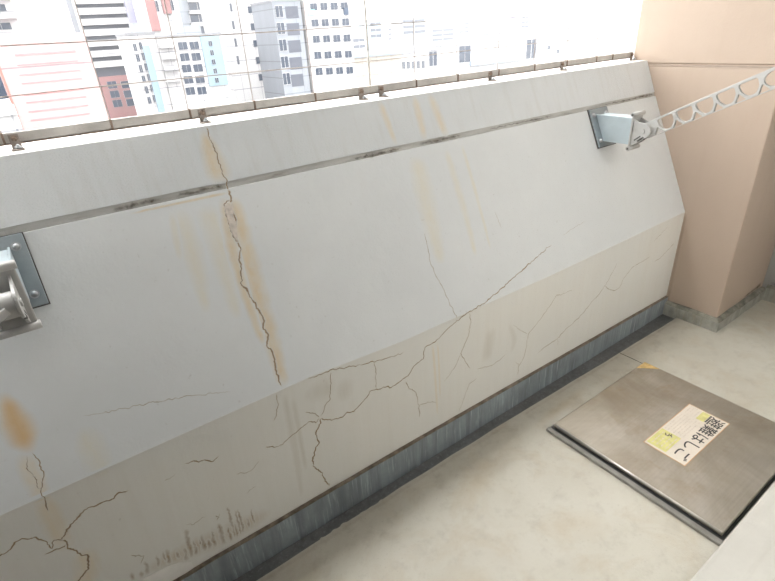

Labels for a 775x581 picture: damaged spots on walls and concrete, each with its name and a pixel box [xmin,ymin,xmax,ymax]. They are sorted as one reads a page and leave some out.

rust [130,129,290,387]
crack [206,127,282,420]
crack [238,224,670,491]
rust [0,392,74,549]
crack [26,453,49,512]
crack [0,490,129,581]
water stain [129,507,272,581]